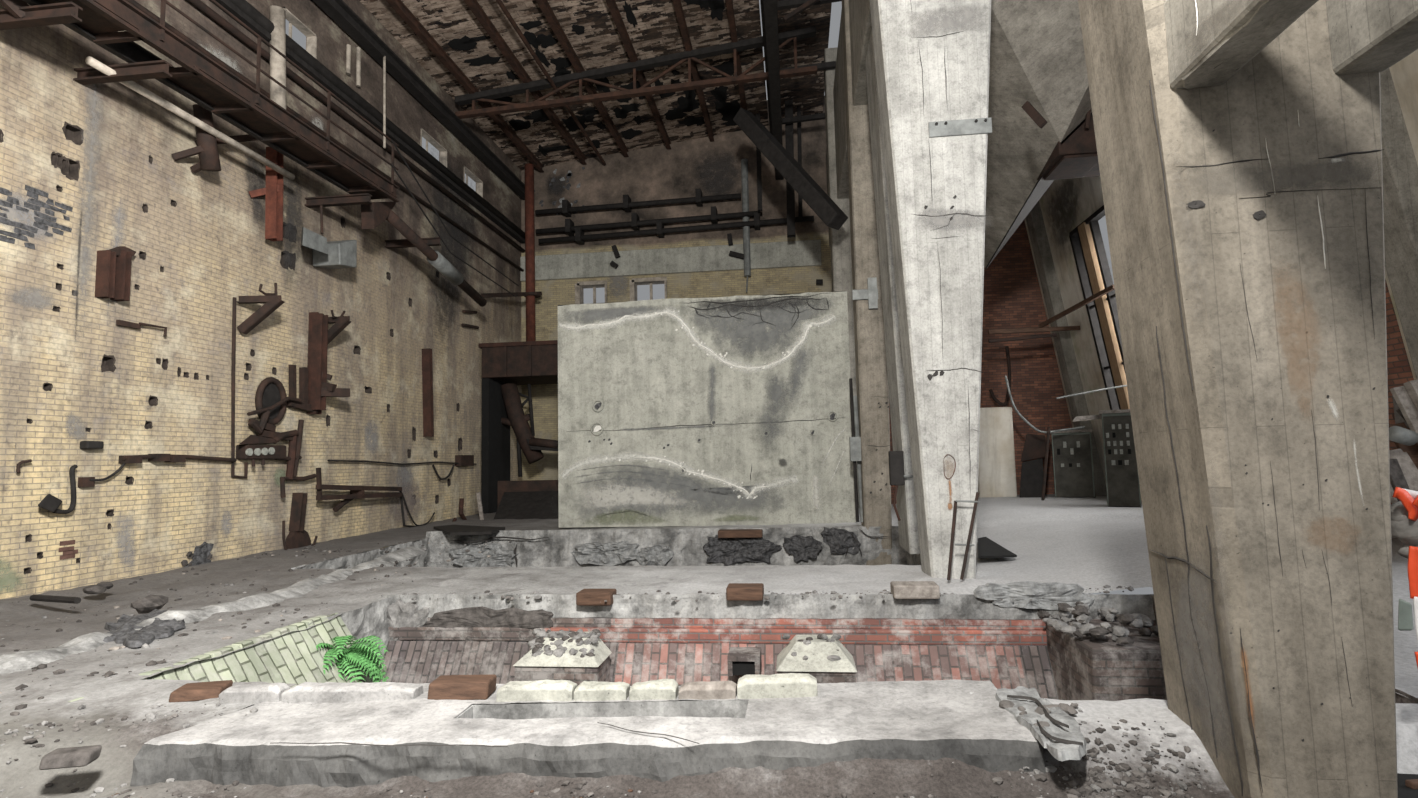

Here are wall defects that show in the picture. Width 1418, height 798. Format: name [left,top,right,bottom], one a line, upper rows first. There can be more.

spalling [0,121,84,249]
spalling [52,263,77,312]
water stain [559,276,836,438]
crack [1149,80,1384,796]
spalling [291,526,921,570]